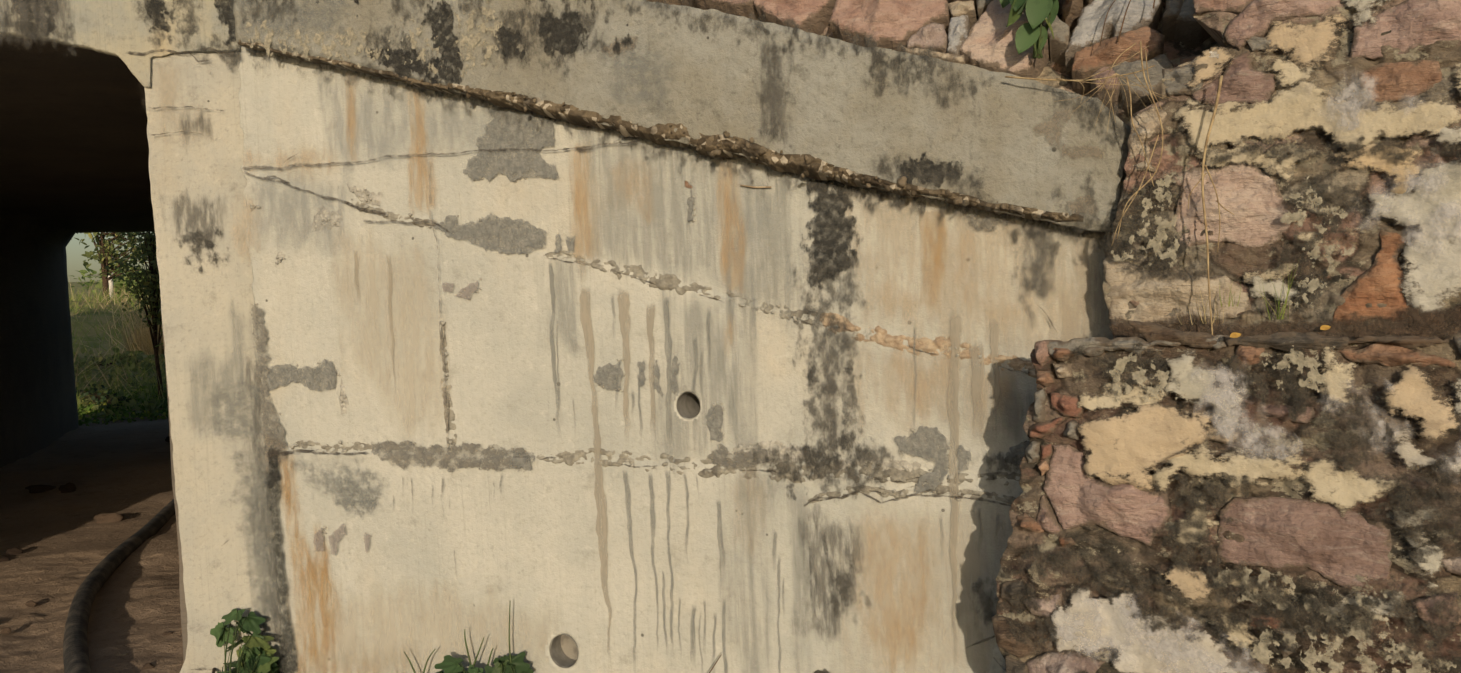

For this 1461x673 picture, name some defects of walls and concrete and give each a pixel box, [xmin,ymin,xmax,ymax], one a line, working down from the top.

water stain [139,0,606,114]
spalling [603,34,637,55]
spalling [238,40,1103,232]
water stain [254,375,297,673]
crack [243,137,635,448]
peeling [370,440,535,472]
water stain [580,291,611,637]
water stain [613,294,672,426]
water stain [624,473,727,673]
water stain [630,137,999,492]
peeling [839,426,971,494]
water stain [1013,172,1206,296]